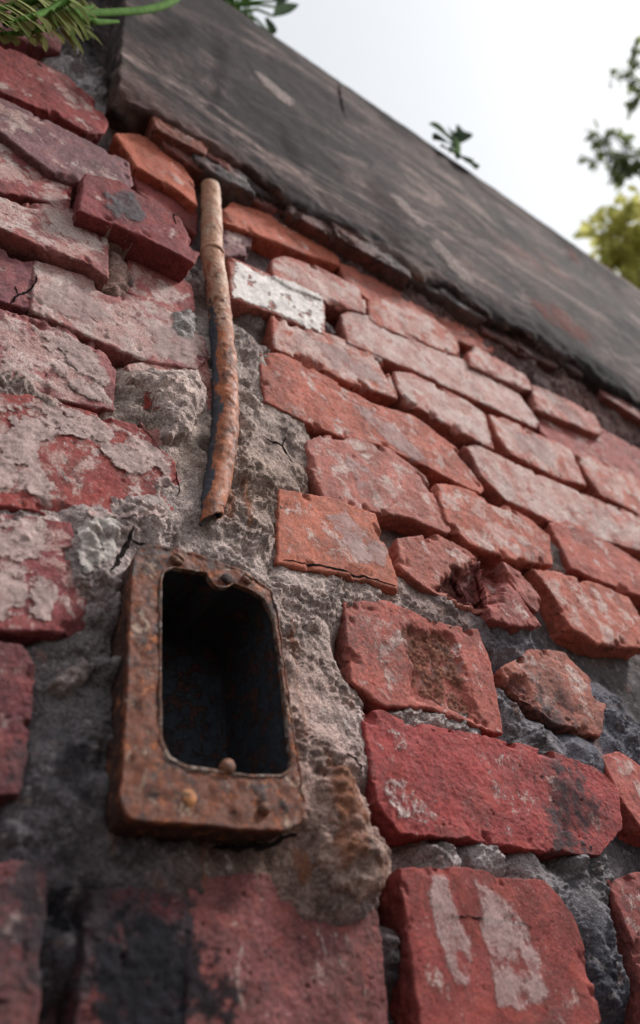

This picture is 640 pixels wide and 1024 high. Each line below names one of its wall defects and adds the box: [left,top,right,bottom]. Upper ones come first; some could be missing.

crack [9,275,38,306]
peeling [232,262,325,333]
peeling [0,401,172,504]
crack [267,436,294,463]
peeling [0,517,59,621]
crack [110,526,146,571]
crack [285,559,396,586]
spalling [436,561,541,634]
water stain [45,886,73,933]
water stain [83,904,248,1024]